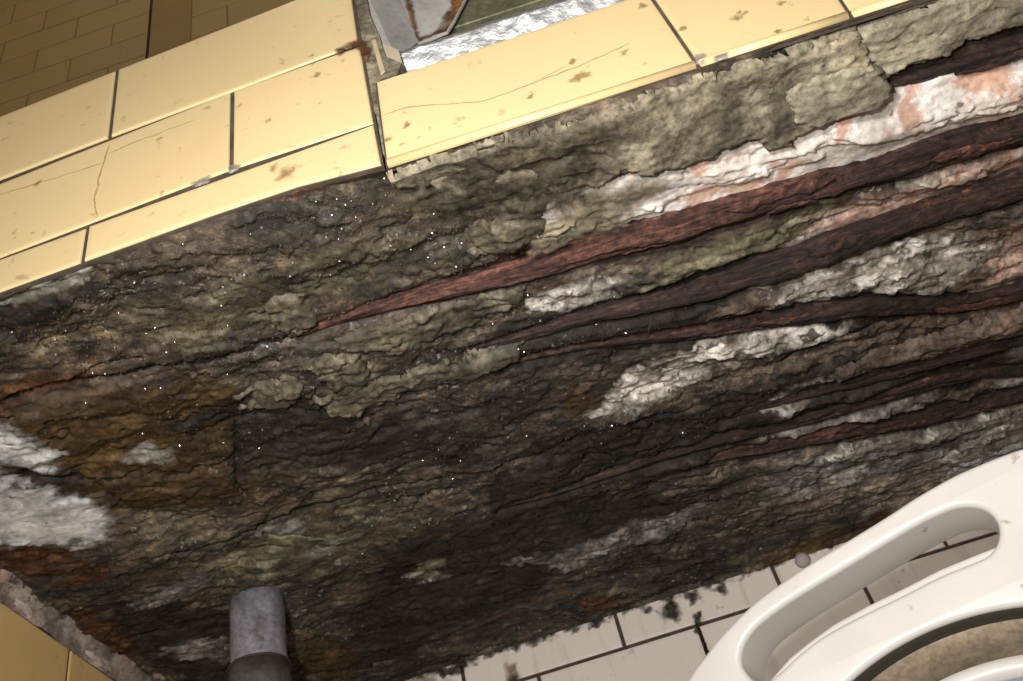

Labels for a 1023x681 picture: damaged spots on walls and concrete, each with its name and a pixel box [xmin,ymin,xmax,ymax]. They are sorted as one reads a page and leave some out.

peeling [99,0,1023,508]
damp [757,236,1003,306]
corrosion [0,368,91,408]
damp [0,433,112,550]
damp [172,386,482,475]
damp [350,268,1023,678]
damp [245,522,351,588]
peeling [0,569,156,681]
crack [695,621,709,655]